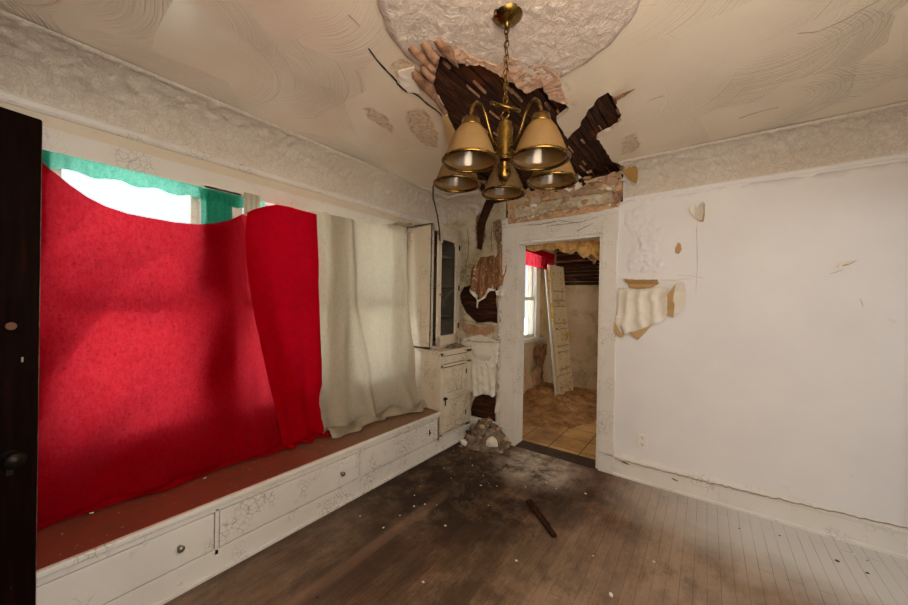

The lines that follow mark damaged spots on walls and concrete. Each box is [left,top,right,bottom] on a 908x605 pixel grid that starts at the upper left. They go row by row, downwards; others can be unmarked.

crack [369,49,442,117]
flaking render [398,38,638,224]
flaking render [460,253,507,323]
spalling [471,394,496,422]
crack [614,458,908,529]